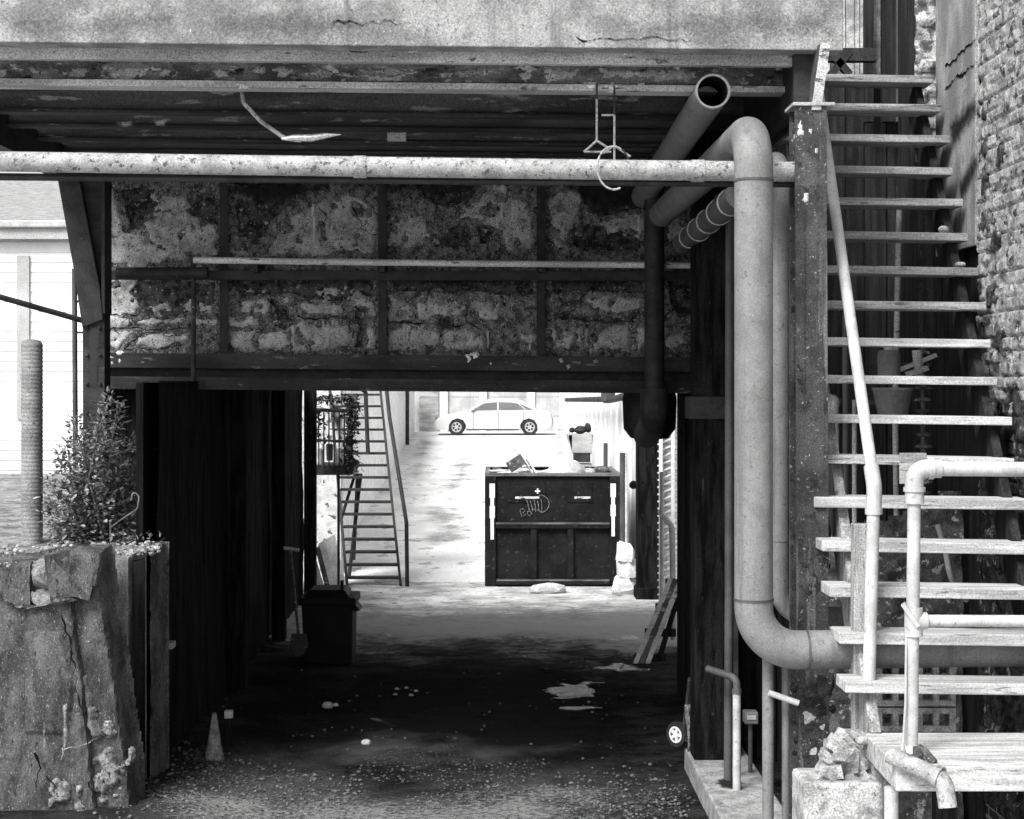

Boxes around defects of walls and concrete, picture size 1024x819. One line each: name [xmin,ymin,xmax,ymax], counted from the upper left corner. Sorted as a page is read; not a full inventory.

crack [333,18,414,26]
crack [576,36,704,44]
crack [945,39,979,90]
spalling [67,67,89,79]
spalling [111,66,178,80]
spalling [252,65,296,78]
damp [393,184,472,195]
crack [33,615,98,795]
spalling [49,675,135,812]